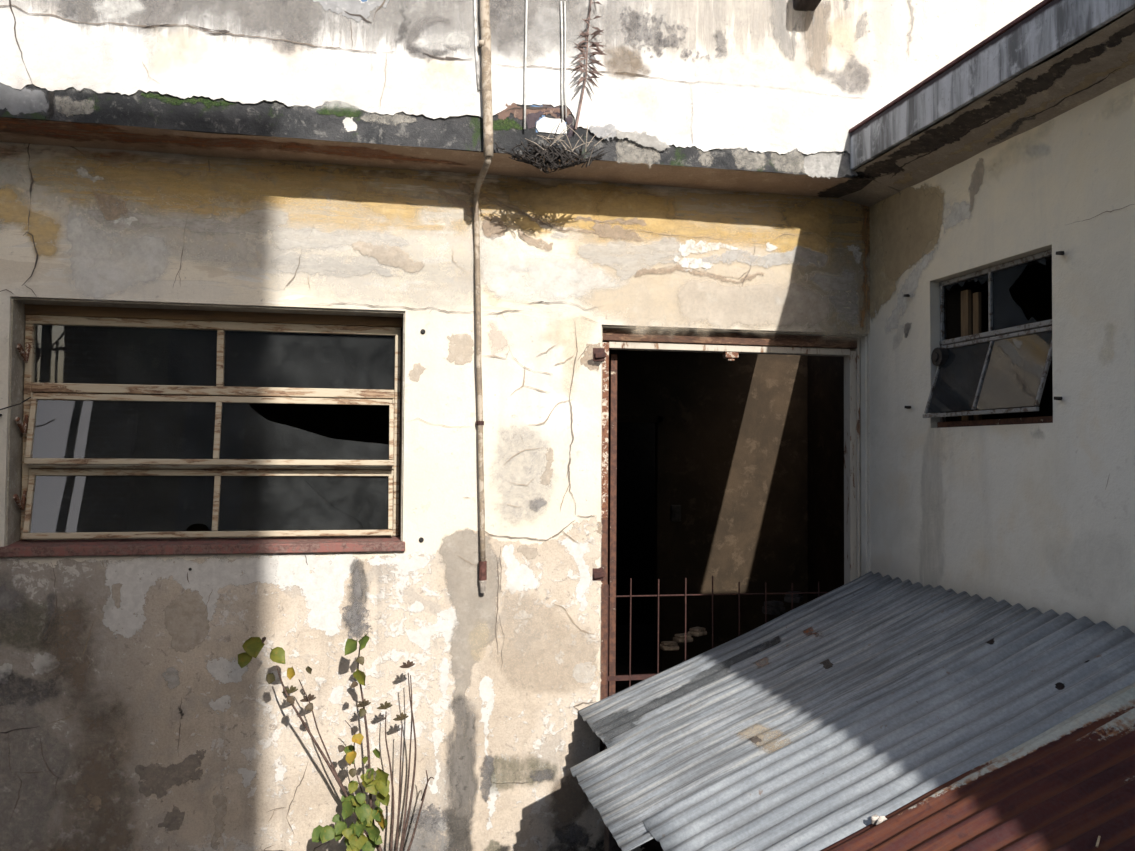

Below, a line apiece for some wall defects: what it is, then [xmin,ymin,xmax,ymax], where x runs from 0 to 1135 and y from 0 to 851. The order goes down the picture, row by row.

peeling [0,83,94,119]
crack [0,0,394,109]
crack [423,52,467,60]
water stain [609,9,727,62]
crack [0,143,38,297]
water stain [969,159,984,211]
peeling [635,237,858,324]
crack [284,227,604,667]
water stain [0,596,132,851]
crack [263,763,330,851]
peeling [0,515,604,851]
water stain [382,697,604,851]